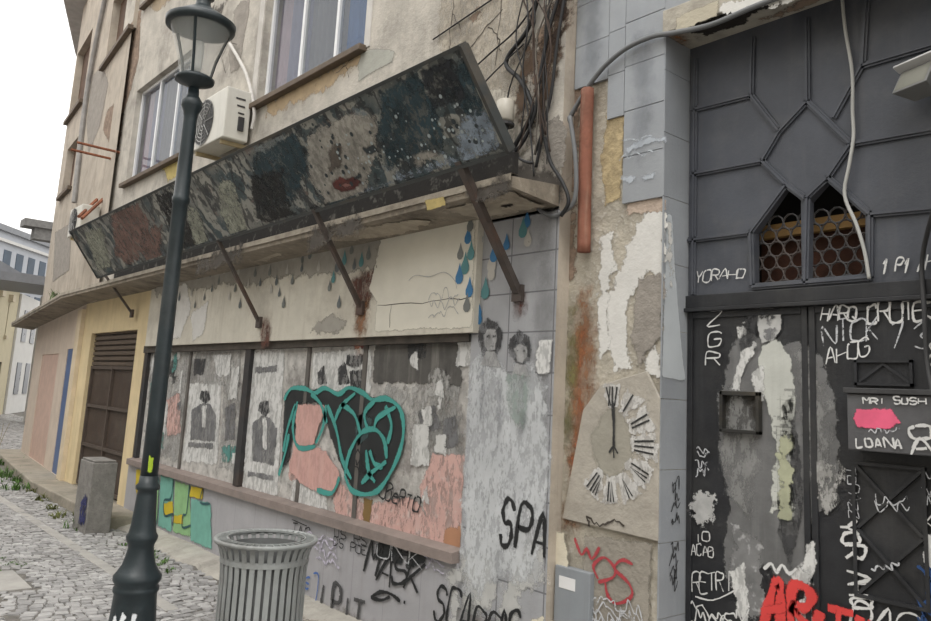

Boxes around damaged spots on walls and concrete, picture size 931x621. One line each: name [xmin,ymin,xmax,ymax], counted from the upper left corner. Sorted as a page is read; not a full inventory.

spalling [228,0,250,73]
peeling [675,0,819,36]
peeling [596,116,686,380]
rust [567,290,598,471]
peeling [556,532,569,567]
flaking render [583,535,652,621]